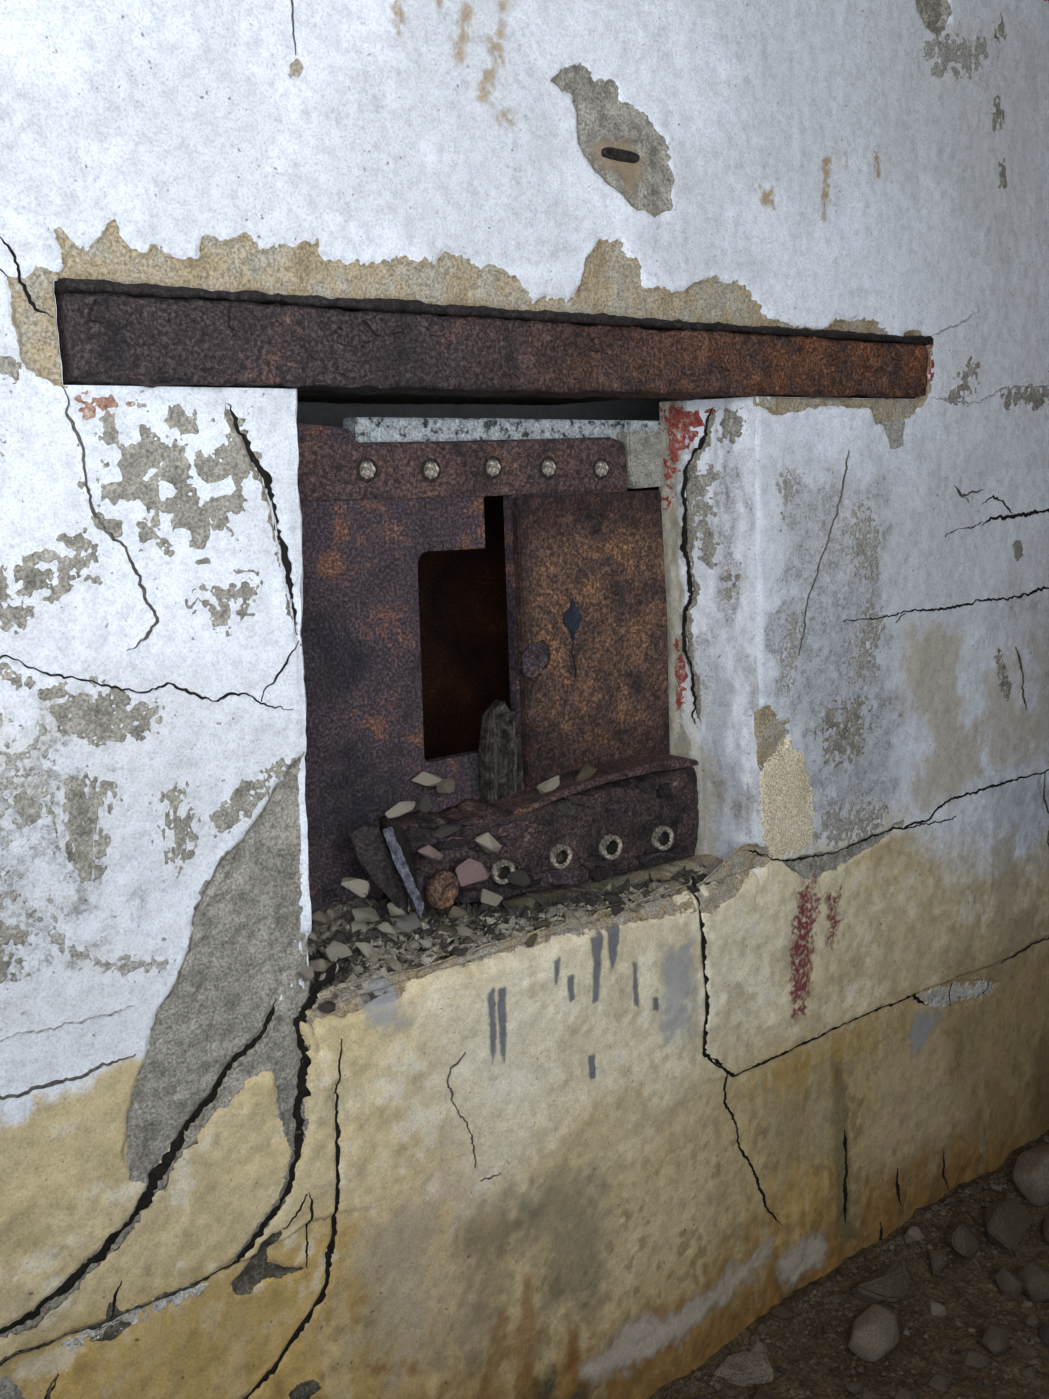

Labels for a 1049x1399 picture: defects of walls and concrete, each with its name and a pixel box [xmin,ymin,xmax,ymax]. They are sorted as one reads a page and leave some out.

spalling [550,62,675,217]
crack [0,386,299,710]
spalling [0,219,980,637]
crack [680,407,720,725]
peeling [0,662,165,884]
crack [0,957,342,1399]
spalling [0,751,904,1185]
damp [488,987,507,1060]
damp [591,924,620,1002]
corrosion [637,845,687,867]
damp [571,1232,826,1399]
crack [691,875,1049,1225]